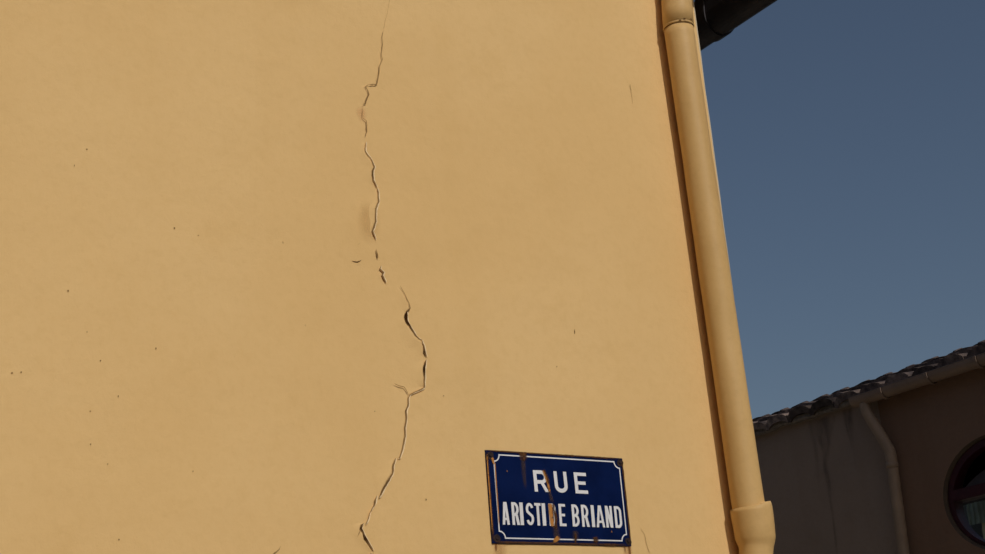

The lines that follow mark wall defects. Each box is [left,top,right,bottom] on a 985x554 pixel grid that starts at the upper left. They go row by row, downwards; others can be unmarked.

crack [350,0,428,554]